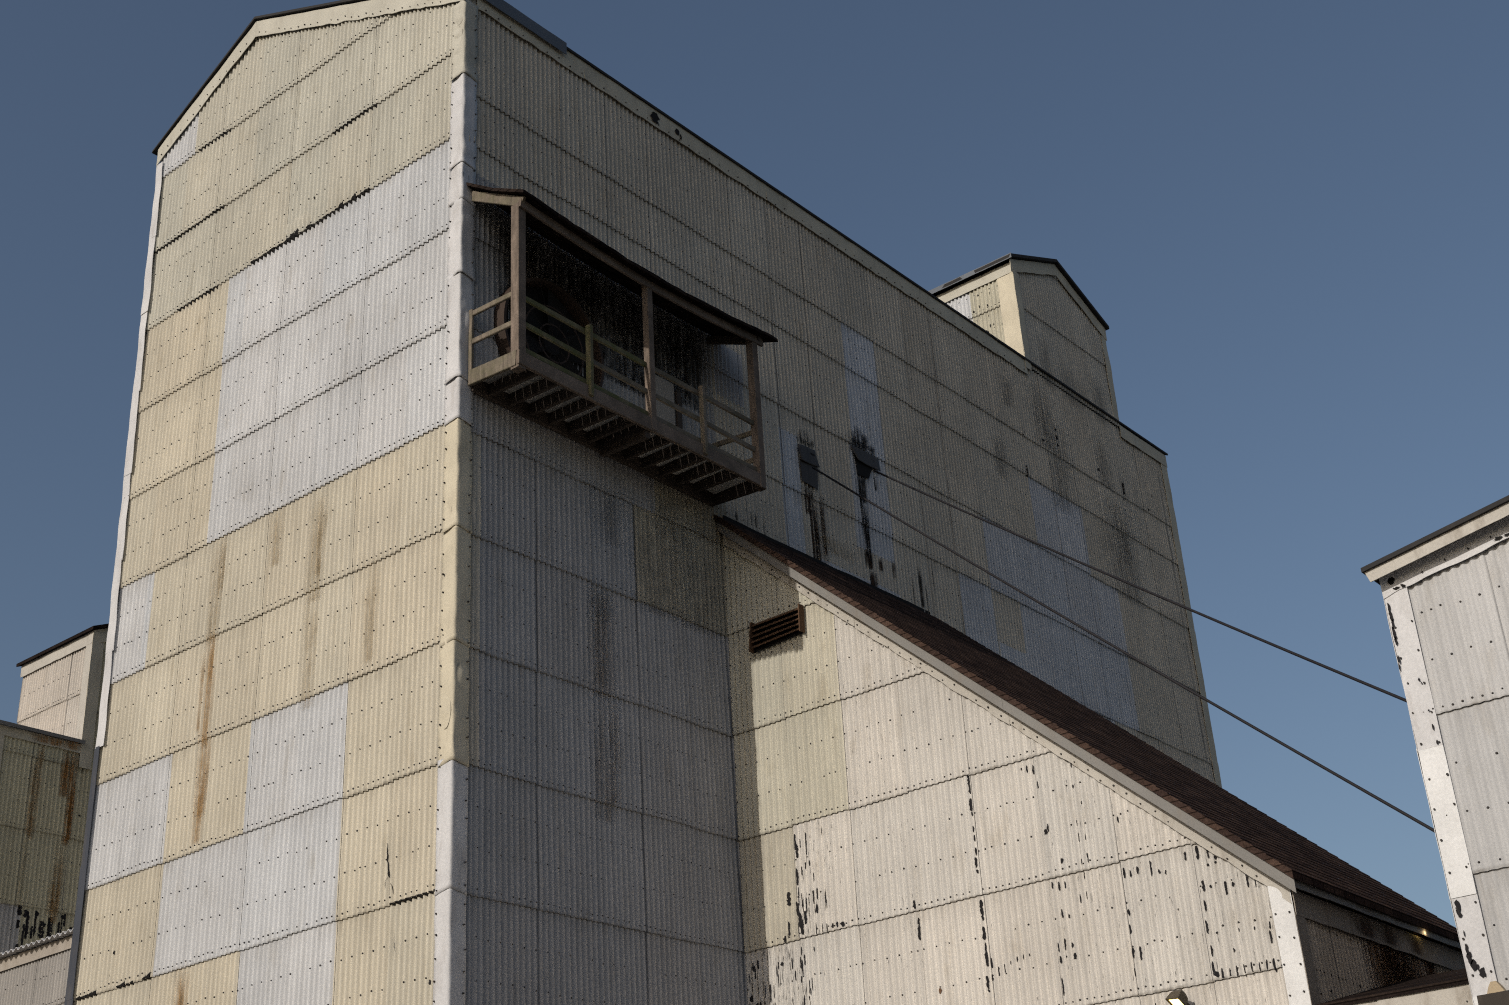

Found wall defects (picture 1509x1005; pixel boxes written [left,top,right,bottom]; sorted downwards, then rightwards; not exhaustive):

damp [858,477,877,563]
peeling [1387,603,1401,671]
rust [38,736,77,843]
peeling [967,775,978,873]
peeling [1051,763,1088,918]
peeling [14,905,73,949]
peeling [749,830,845,1005]
peeling [979,900,1030,992]
peeling [1454,900,1486,977]